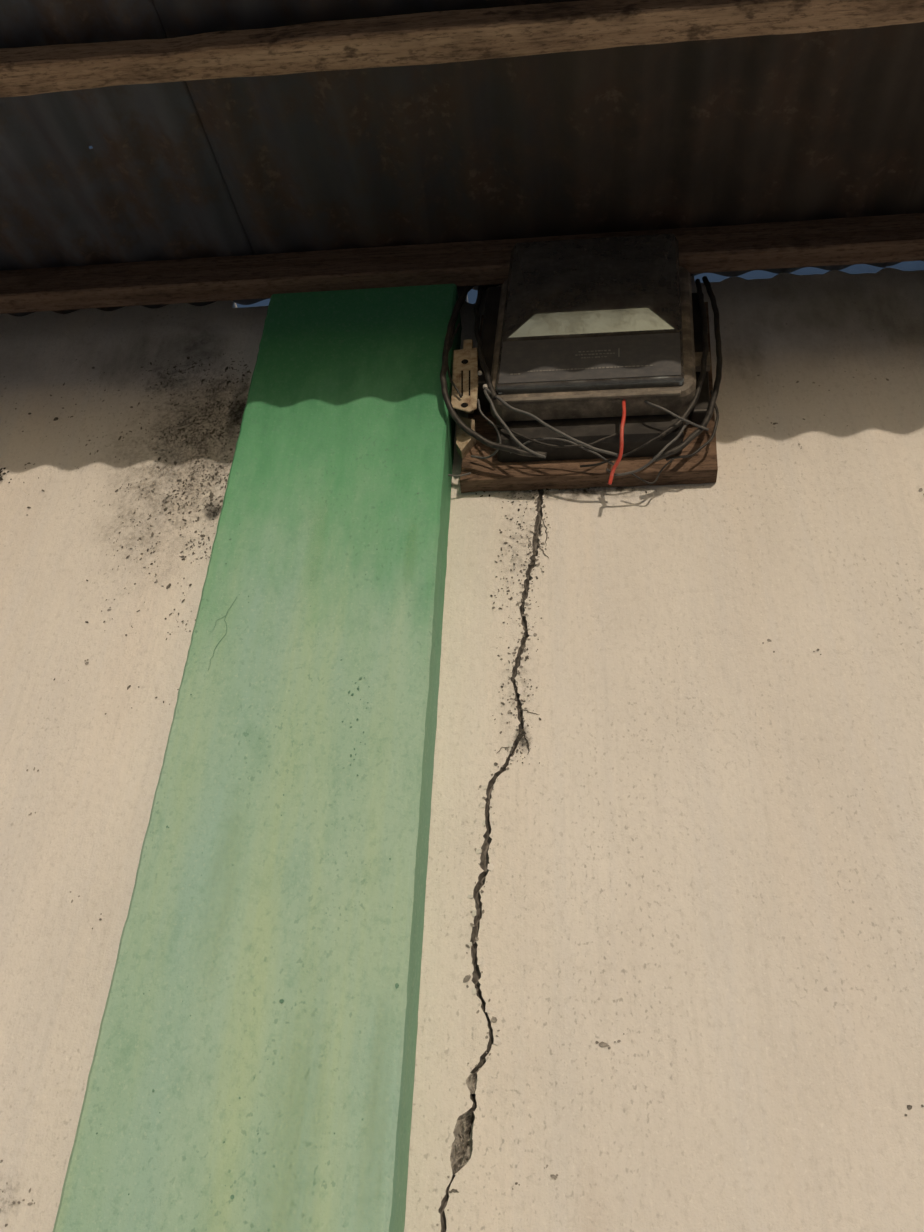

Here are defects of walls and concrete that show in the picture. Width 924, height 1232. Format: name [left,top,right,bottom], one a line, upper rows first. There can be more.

water stain [104,353,251,640]
crack [463,489,549,1112]
crack [431,1175,459,1232]